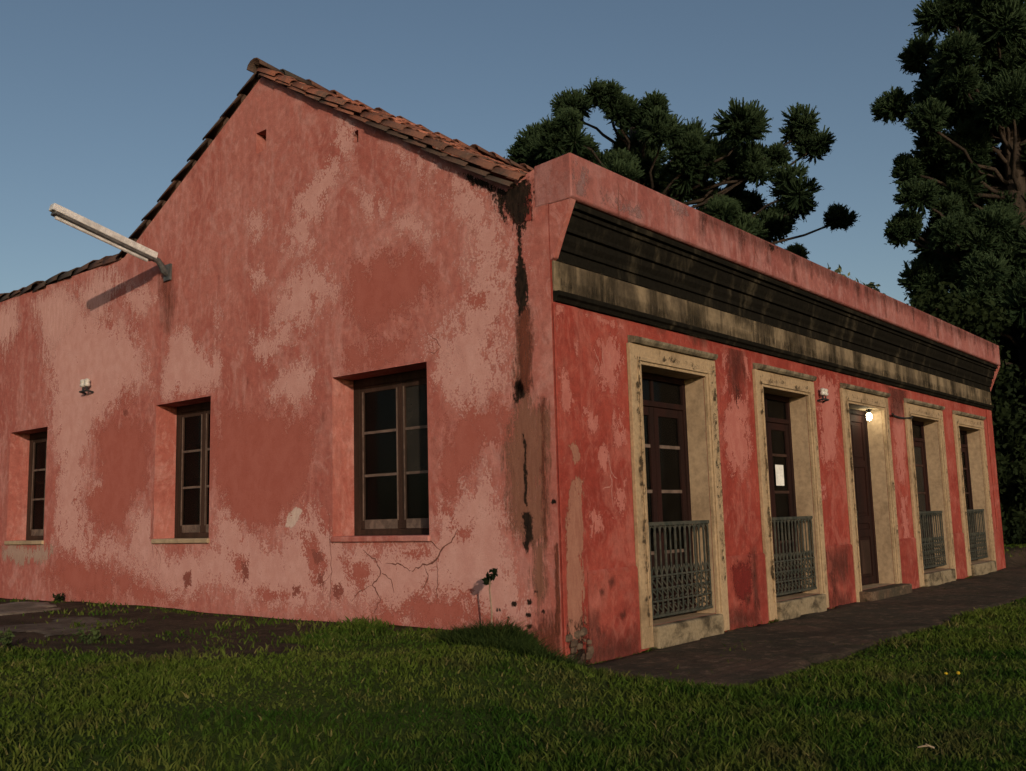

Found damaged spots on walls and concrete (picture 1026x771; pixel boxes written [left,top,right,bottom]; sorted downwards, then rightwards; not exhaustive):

peeling [240,115,542,423]
water stain [463,173,535,235]
peeling [2,272,627,665]
crack [322,513,458,613]